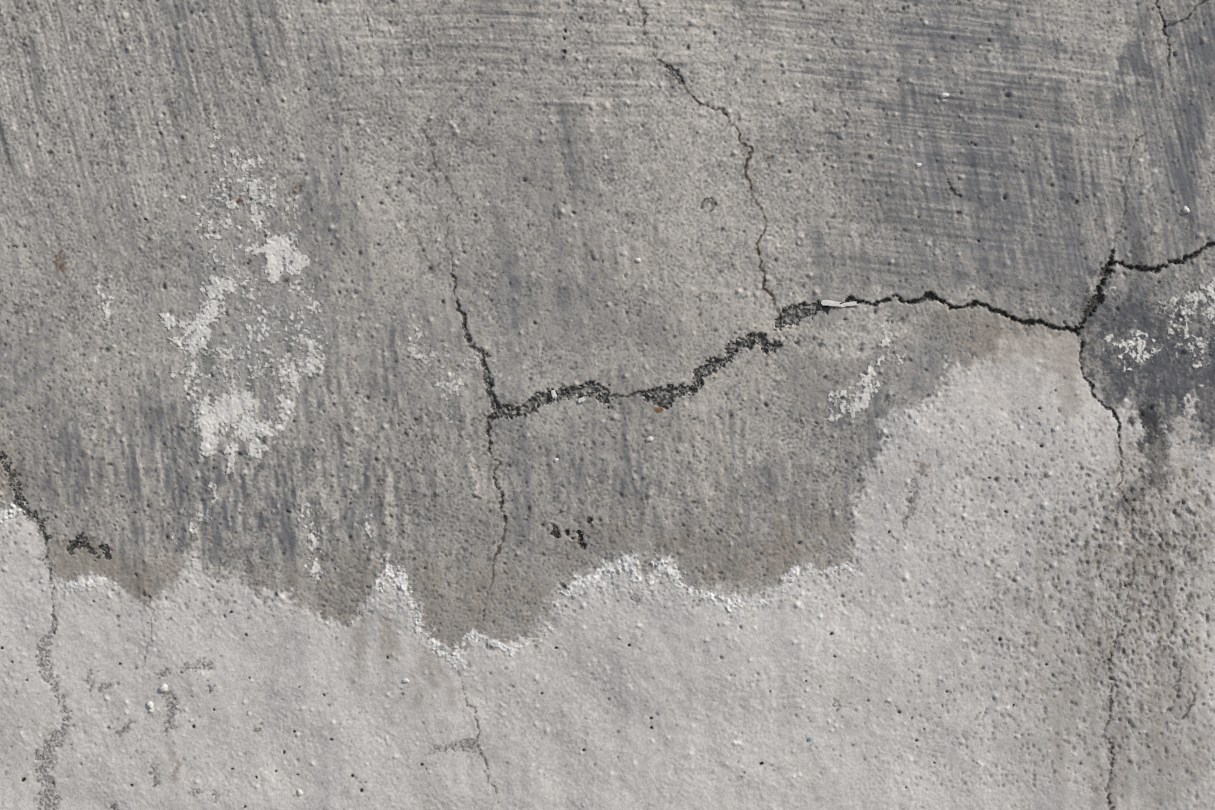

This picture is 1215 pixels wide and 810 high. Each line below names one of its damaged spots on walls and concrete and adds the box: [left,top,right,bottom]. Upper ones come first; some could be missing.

crack [439,0,1215,578]
water stain [0,499,26,524]
crack [0,452,57,633]
water stain [50,577,117,591]
water stain [366,553,560,669]
water stain [557,553,855,612]
crack [429,702,496,788]
crack [1107,620,1130,808]